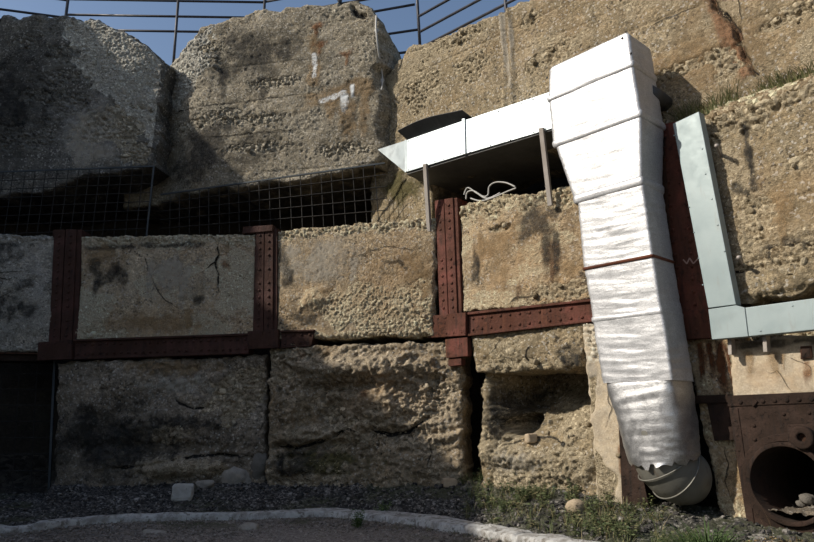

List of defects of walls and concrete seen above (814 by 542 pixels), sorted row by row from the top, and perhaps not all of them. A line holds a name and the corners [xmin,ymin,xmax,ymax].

crack [653,0,759,76]
rust [708,0,752,77]
leakage [87,241,203,293]
crack [207,246,220,291]
leakage [521,197,560,270]
rust [697,342,733,388]